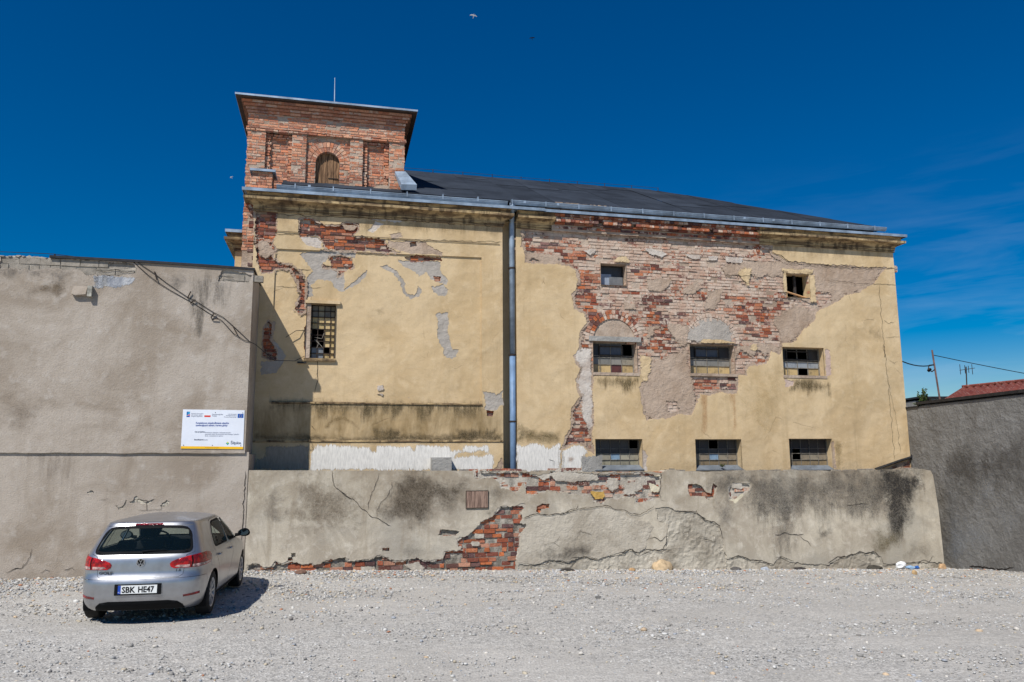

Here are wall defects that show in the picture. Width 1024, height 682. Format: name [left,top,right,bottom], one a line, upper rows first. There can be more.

spalling [538,202,724,222]
spalling [218,203,448,350]
crack [773,252,901,457]
leakage [350,431,500,441]
spalling [247,224,942,571]
crack [332,472,390,526]
leakage [390,477,460,520]
crack [526,471,811,565]
leakage [749,472,917,549]